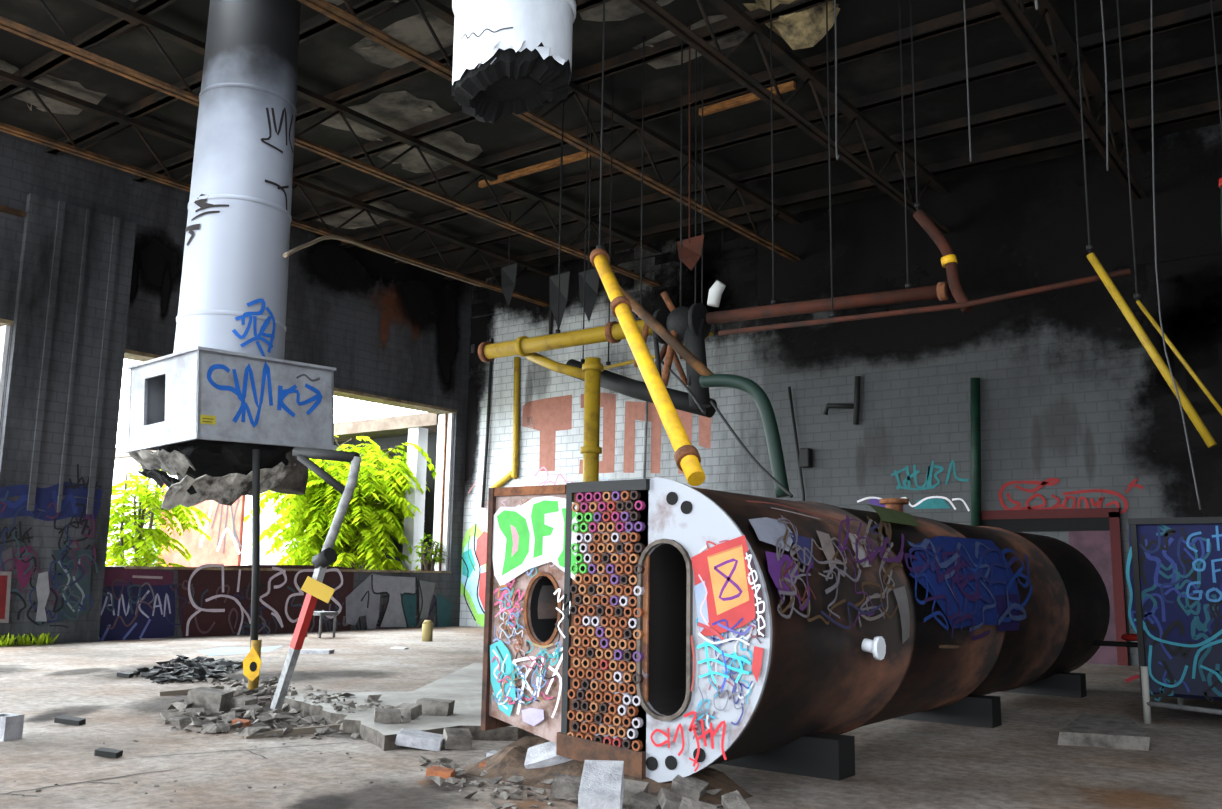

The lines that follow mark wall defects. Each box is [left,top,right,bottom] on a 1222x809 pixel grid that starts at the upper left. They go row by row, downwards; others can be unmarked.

damp [633,135,1222,517]